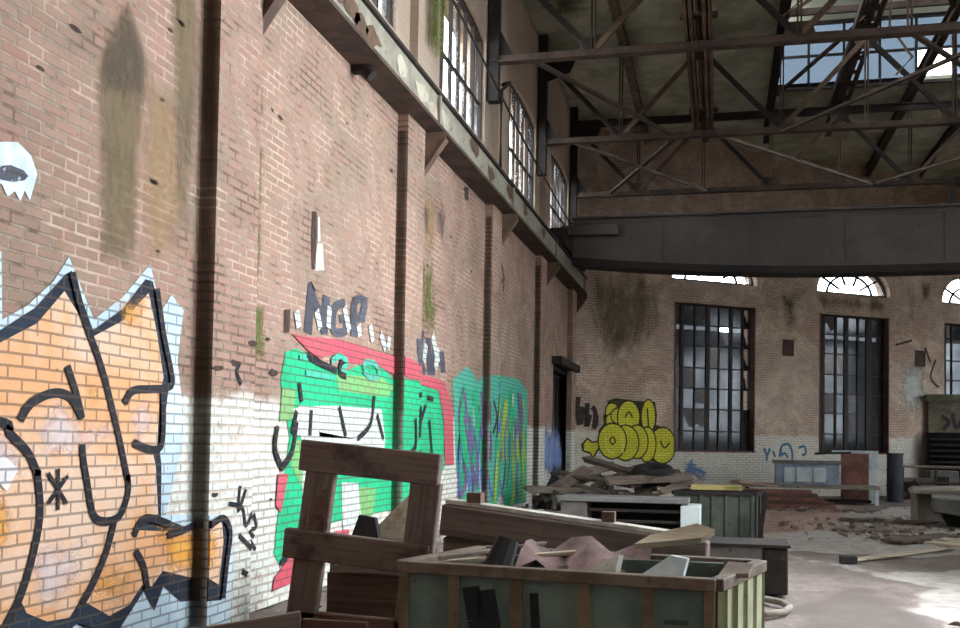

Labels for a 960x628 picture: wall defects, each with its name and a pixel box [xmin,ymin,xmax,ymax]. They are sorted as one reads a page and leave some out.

damp [101,23,143,258]
damp [174,0,217,187]
peeling [338,0,382,47]
peeling [396,54,449,131]
damp [597,280,649,350]
damp [190,208,211,626]